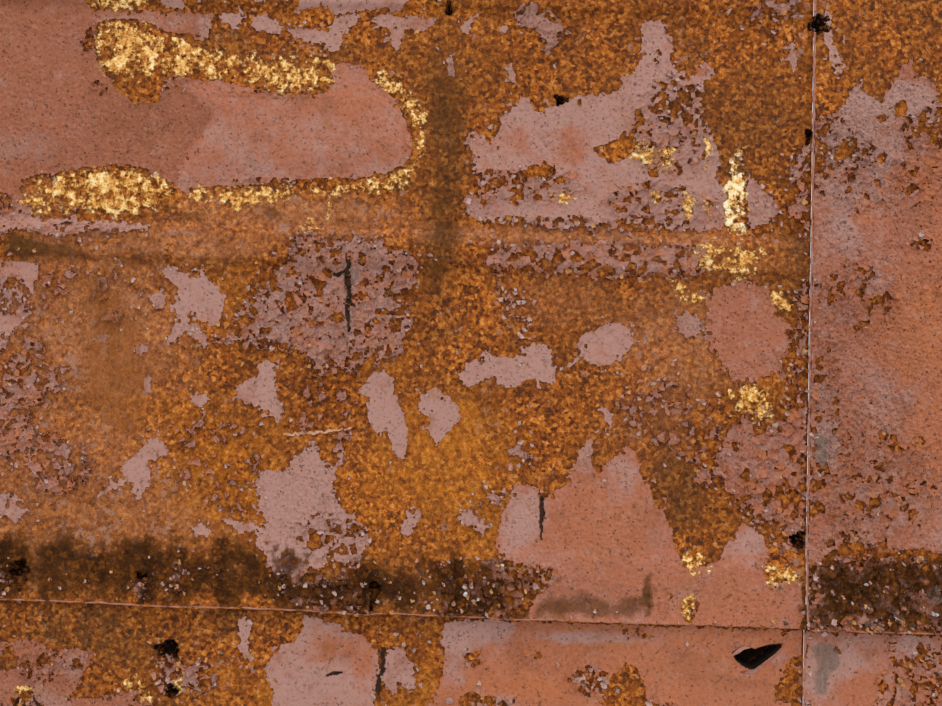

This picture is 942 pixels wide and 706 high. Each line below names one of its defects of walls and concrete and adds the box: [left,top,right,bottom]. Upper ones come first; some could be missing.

rust [92,0,336,93]
rust [19,168,294,218]
peeling [0,0,439,251]
rust [300,70,428,233]
rust [693,150,767,281]
rust [770,291,791,312]
peeling [423,0,942,706]
peeling [415,387,461,446]
rust [728,384,773,424]
peeling [0,221,437,706]
rust [0,528,528,619]
rust [799,552,942,633]